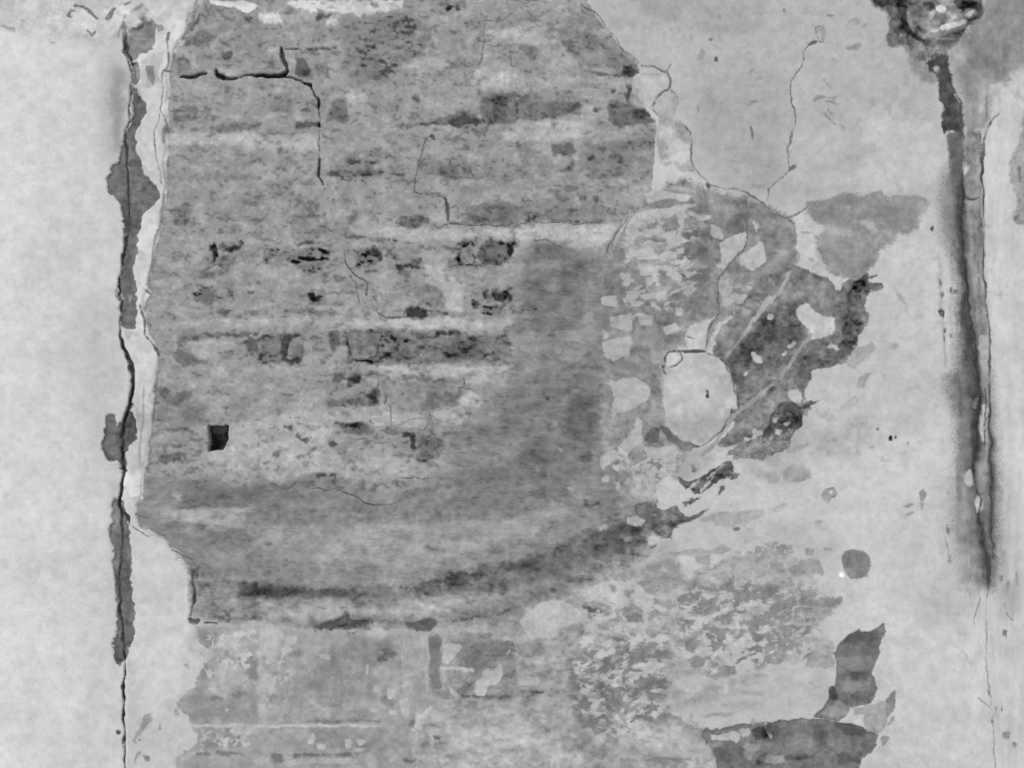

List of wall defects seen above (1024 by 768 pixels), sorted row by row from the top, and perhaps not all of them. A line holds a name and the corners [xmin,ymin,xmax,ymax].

spalling [125,15,156,60]
spalling [106,87,160,330]
crack [116,34,324,768]
peeling [596,512,625,531]
peeling [597,352,701,506]
crack [581,3,826,445]
water stain [733,425,812,485]
peeling [701,190,930,462]
water stain [904,0,1024,596]
spalling [702,718,879,768]
spalling [815,623,896,733]